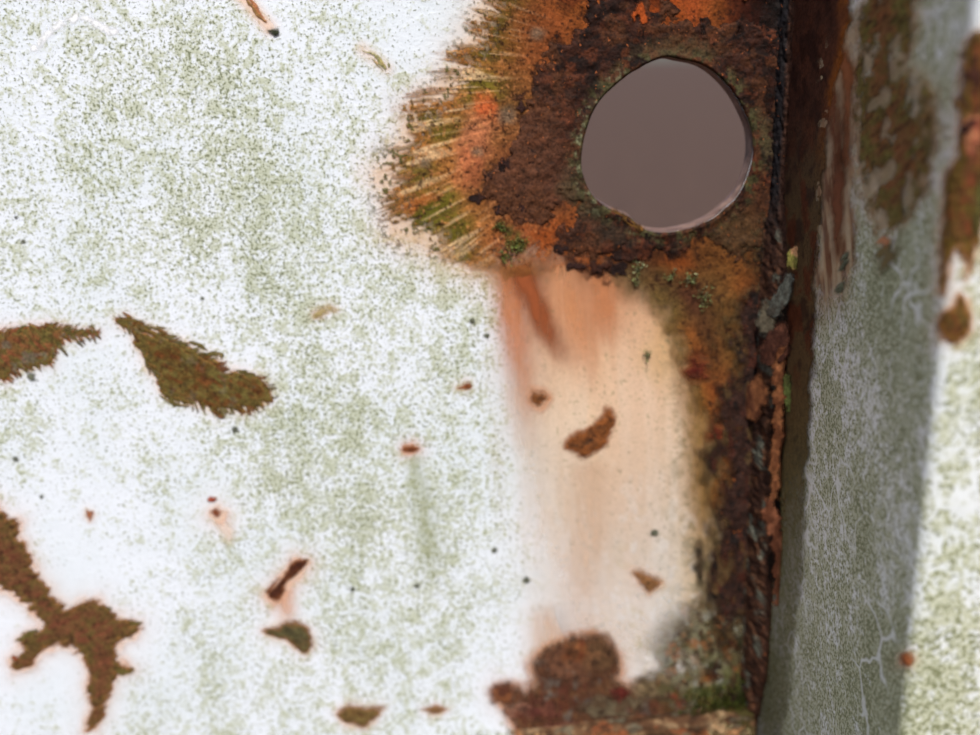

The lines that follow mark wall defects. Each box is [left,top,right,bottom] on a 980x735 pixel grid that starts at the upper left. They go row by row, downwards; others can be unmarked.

rust [246,0,267,22]
rust [371,0,980,707]